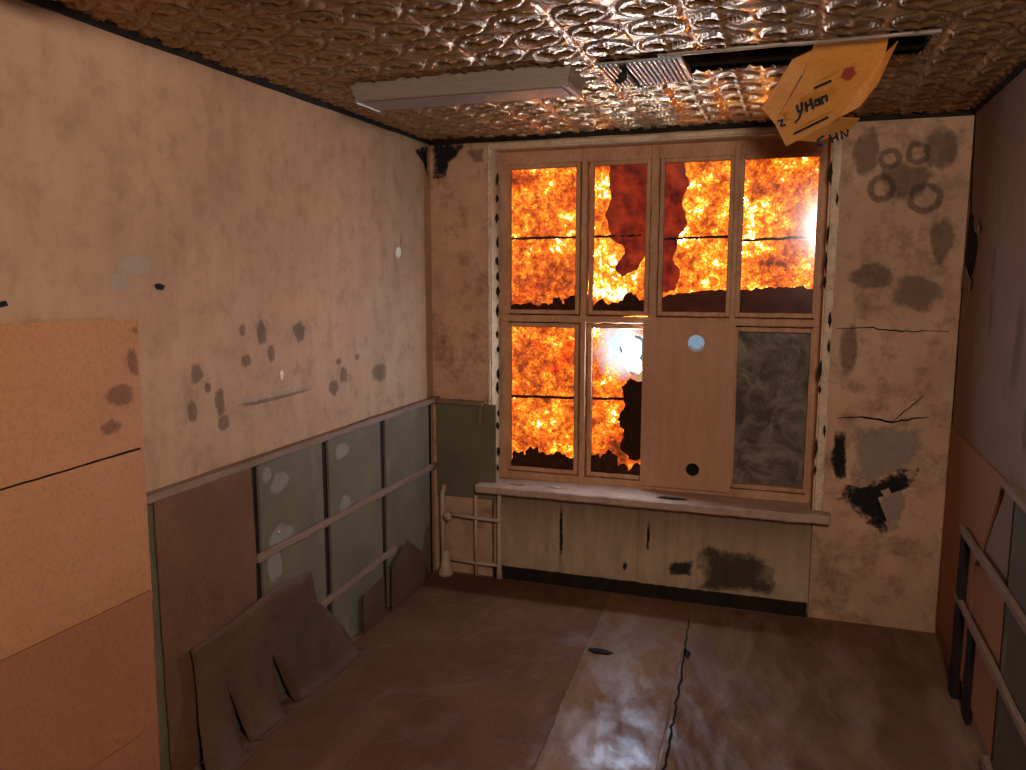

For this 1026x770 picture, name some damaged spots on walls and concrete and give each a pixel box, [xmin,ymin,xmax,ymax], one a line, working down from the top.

crack [661,619,691,770]